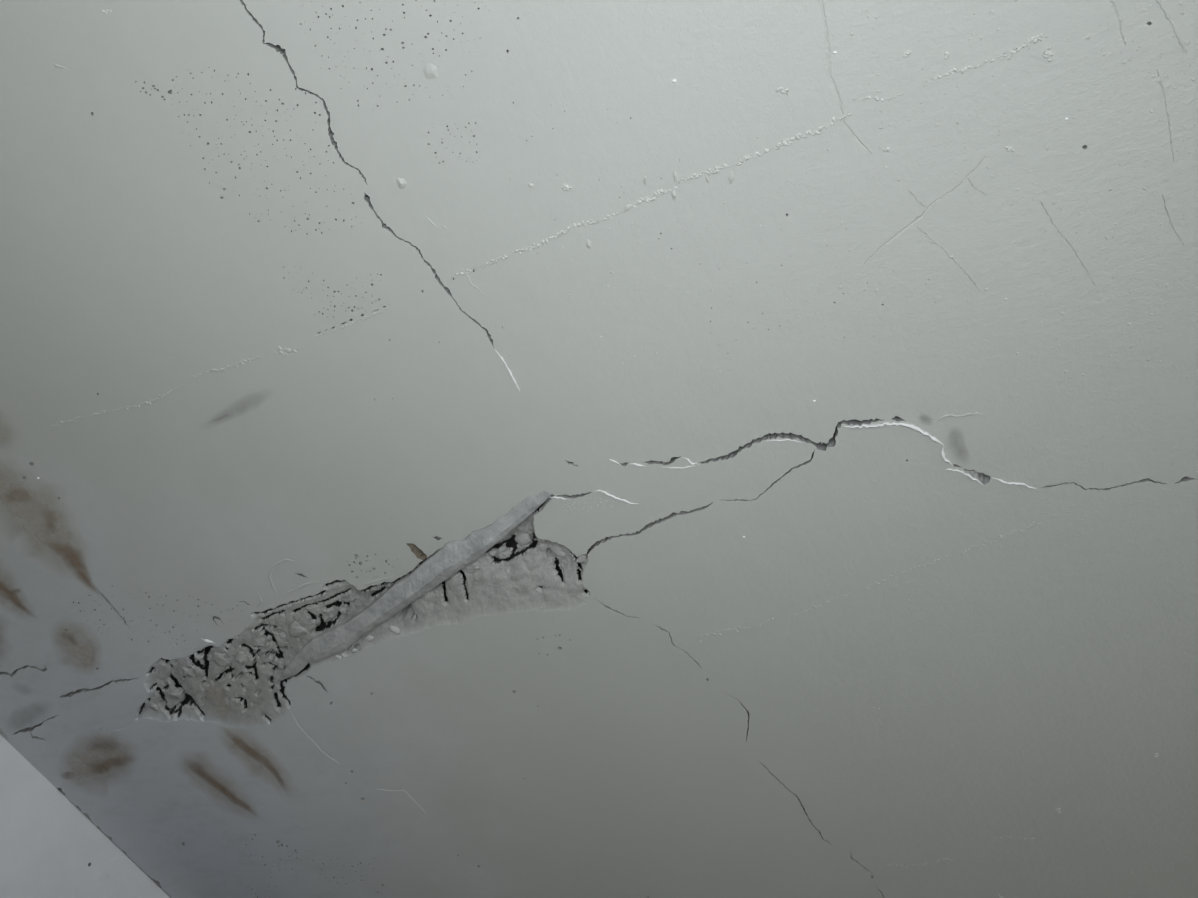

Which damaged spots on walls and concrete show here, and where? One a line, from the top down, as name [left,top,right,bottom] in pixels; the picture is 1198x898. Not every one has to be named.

crack [239,0,520,391]
crack [549,412,1198,558]
crack [0,665,47,678]
crack [12,678,137,741]
flaking render [134,491,593,730]
crack [596,599,700,666]
crack [57,788,171,898]
crack [722,692,884,898]